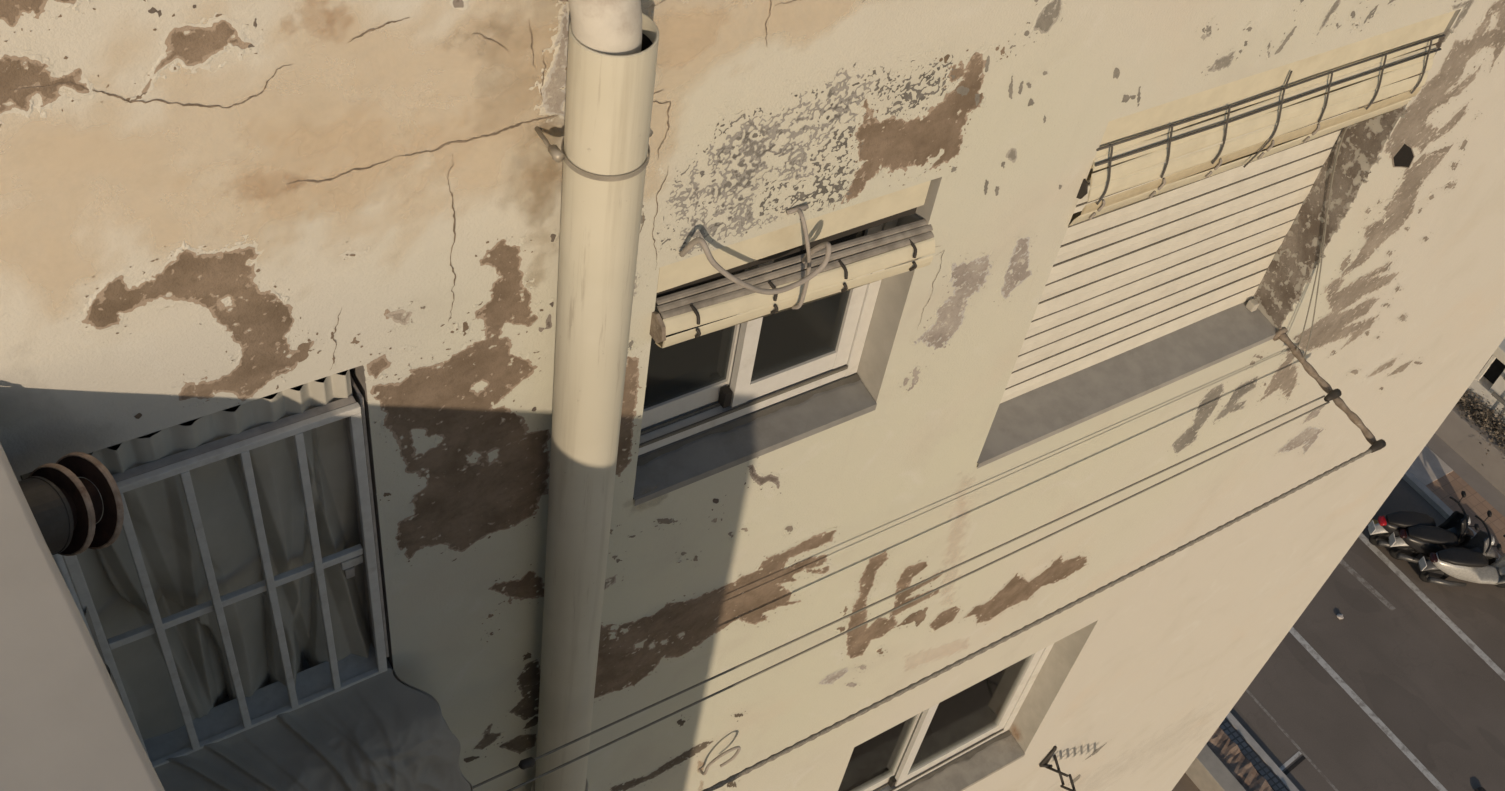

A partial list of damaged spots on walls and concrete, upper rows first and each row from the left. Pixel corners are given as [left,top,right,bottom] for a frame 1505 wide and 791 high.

peeling [0,0,109,131]
crack [10,64,292,108]
peeling [126,0,265,104]
crack [350,17,410,42]
crack [289,22,557,321]
crack [765,0,796,43]
peeling [633,0,1067,298]
peeling [1167,0,1505,458]
peeling [75,230,559,567]
peeling [615,334,647,483]
peeling [594,514,840,703]
peeling [815,548,1092,690]